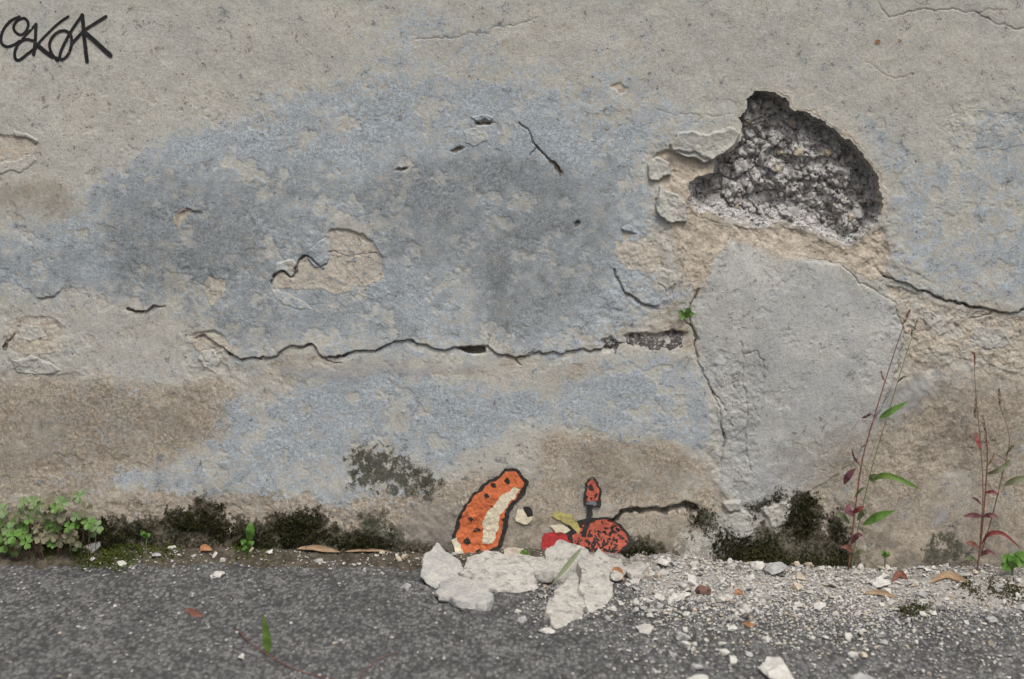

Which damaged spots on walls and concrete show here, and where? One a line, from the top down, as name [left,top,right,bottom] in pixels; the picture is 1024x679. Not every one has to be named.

crack [522,125,564,176]
spalling [604,86,1024,376]
spalling [272,229,391,310]
crack [843,266,1024,317]
crack [228,336,623,365]
crack [684,289,715,396]
leakage [343,442,445,503]
leakage [61,490,454,555]
leakage [626,534,681,556]
crack [611,501,699,521]
leakage [688,503,716,539]
leakage [713,491,861,567]